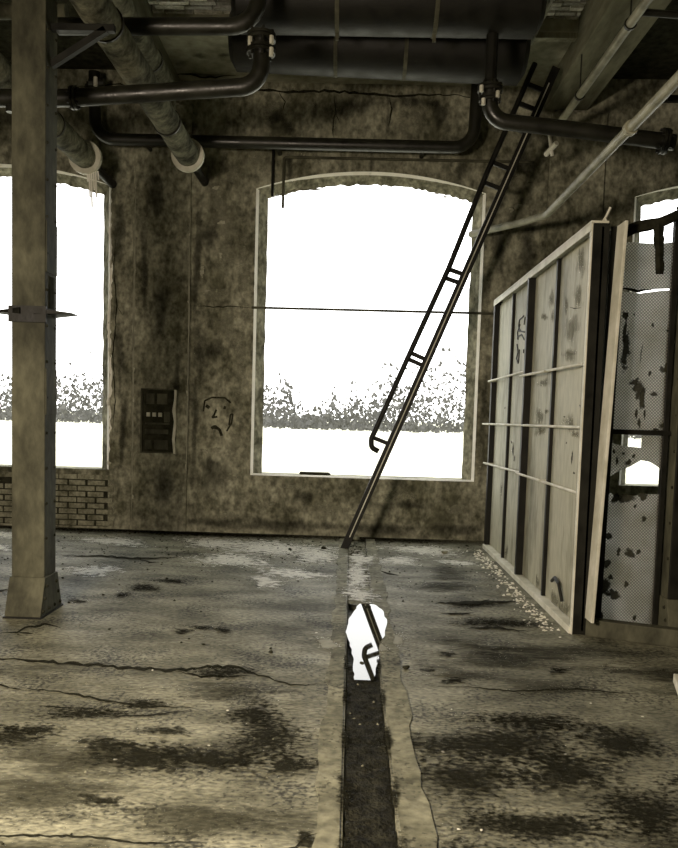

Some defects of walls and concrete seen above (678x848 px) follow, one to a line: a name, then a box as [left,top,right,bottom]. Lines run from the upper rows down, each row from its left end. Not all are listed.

peeling [620,312,635,372]
peeling [629,363,667,428]
peeling [611,492,647,508]
peeling [602,548,641,600]
crack [0,658,316,717]
water stain [30,699,181,721]
water stain [454,711,607,733]
water stain [160,747,266,772]
water stain [0,780,105,807]
crack [0,834,193,844]
crack [289,831,317,848]
water stain [436,806,630,846]